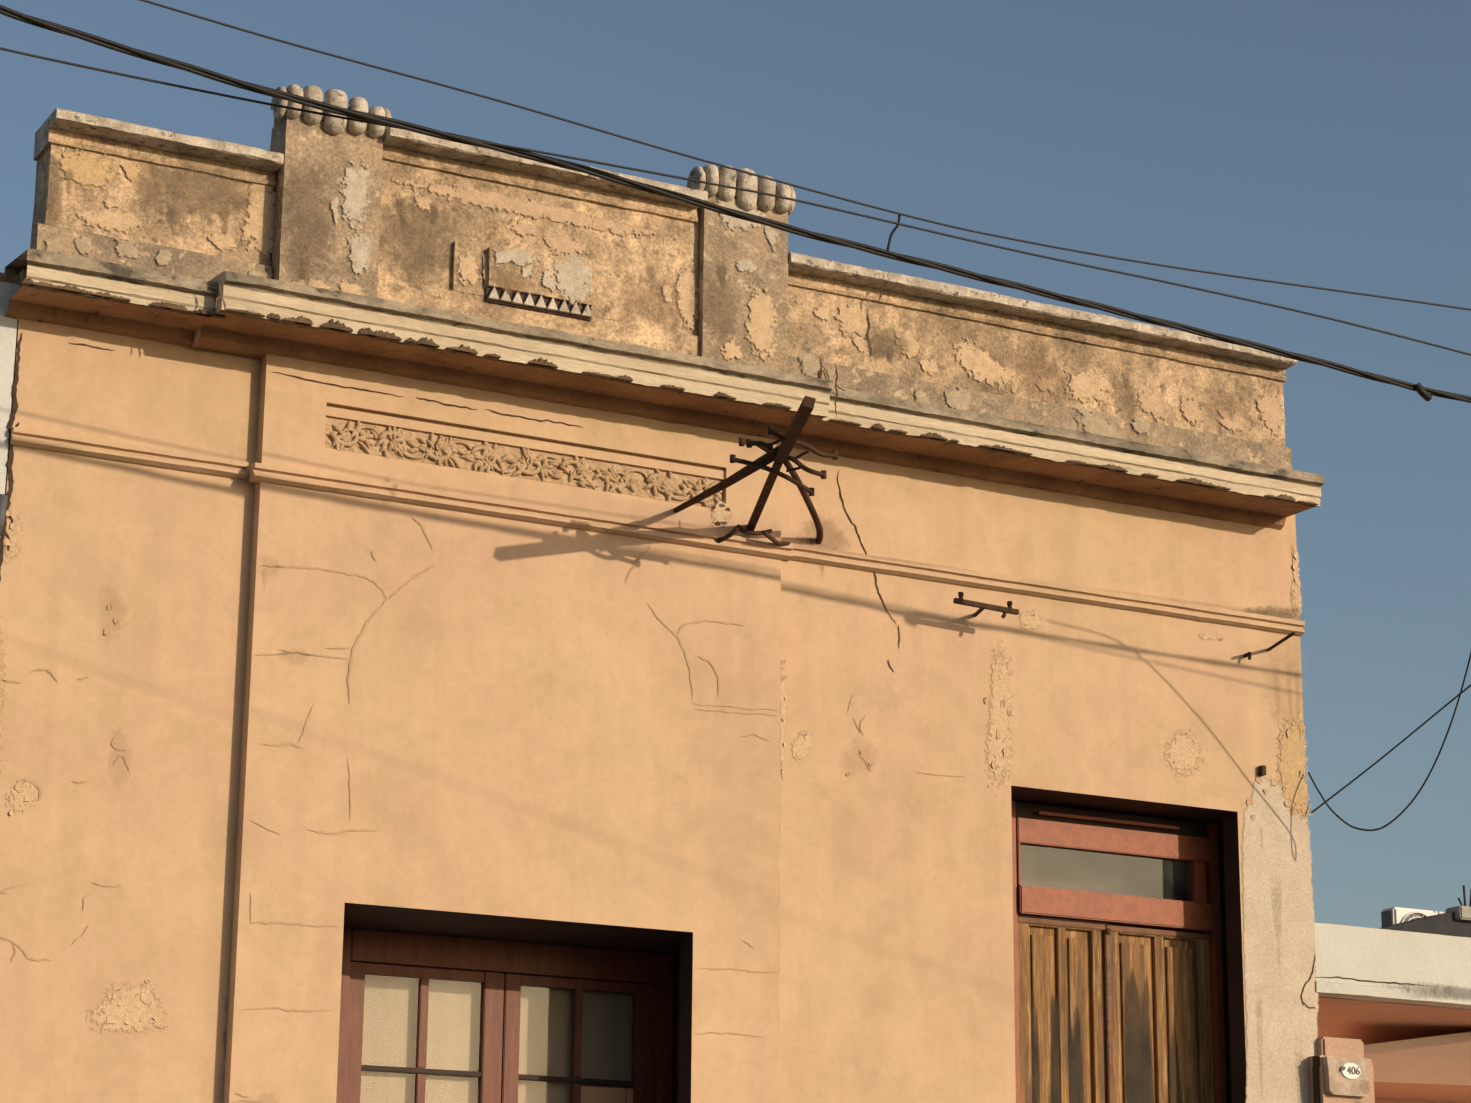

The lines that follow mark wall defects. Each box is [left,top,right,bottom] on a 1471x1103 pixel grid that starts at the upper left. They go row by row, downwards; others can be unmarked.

peeling [45,146,172,266]
peeling [208,176,277,279]
peeling [292,159,373,296]
peeling [714,199,777,251]
peeling [720,259,780,364]
peeling [895,327,1287,440]
crack [257,518,437,703]
crack [837,472,900,672]
crack [261,707,313,749]
crack [0,882,119,962]
peeling [1242,714,1319,1103]
peeling [86,980,168,1035]